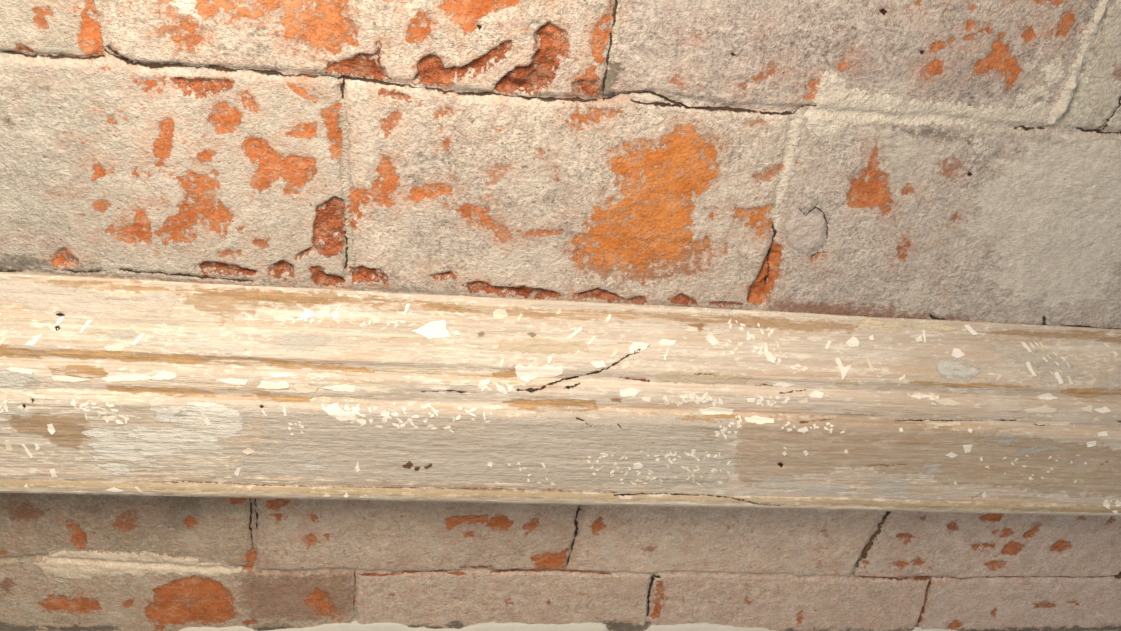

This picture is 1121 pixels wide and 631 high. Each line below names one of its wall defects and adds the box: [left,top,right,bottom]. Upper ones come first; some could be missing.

peeling [133,0,412,137]
peeling [241,83,343,196]
crack [0,0,816,115]
spalling [405,0,570,95]
crack [1014,124,1044,132]
crack [1075,96,1121,134]
peeling [42,149,470,339]
crack [342,231,350,269]
spalling [429,272,647,322]
peeling [455,123,727,281]
spalling [668,204,808,372]
crack [852,511,1121,625]